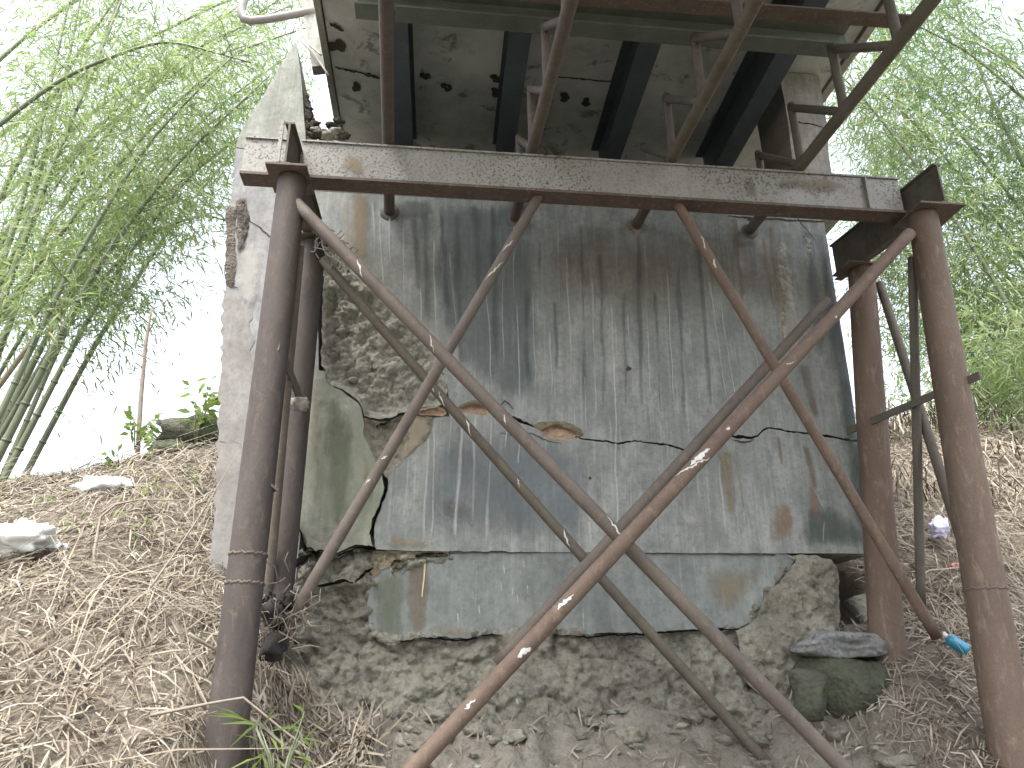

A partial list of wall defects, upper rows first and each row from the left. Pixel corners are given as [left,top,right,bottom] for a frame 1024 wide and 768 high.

damp [445,210,532,386]
flaking render [209,198,254,576]
spalling [320,255,448,478]
crack [376,414,404,428]
crack [500,400,684,451]
crack [732,427,857,443]
crack [296,475,387,587]
spalling [370,550,449,578]
spalling [736,554,841,697]